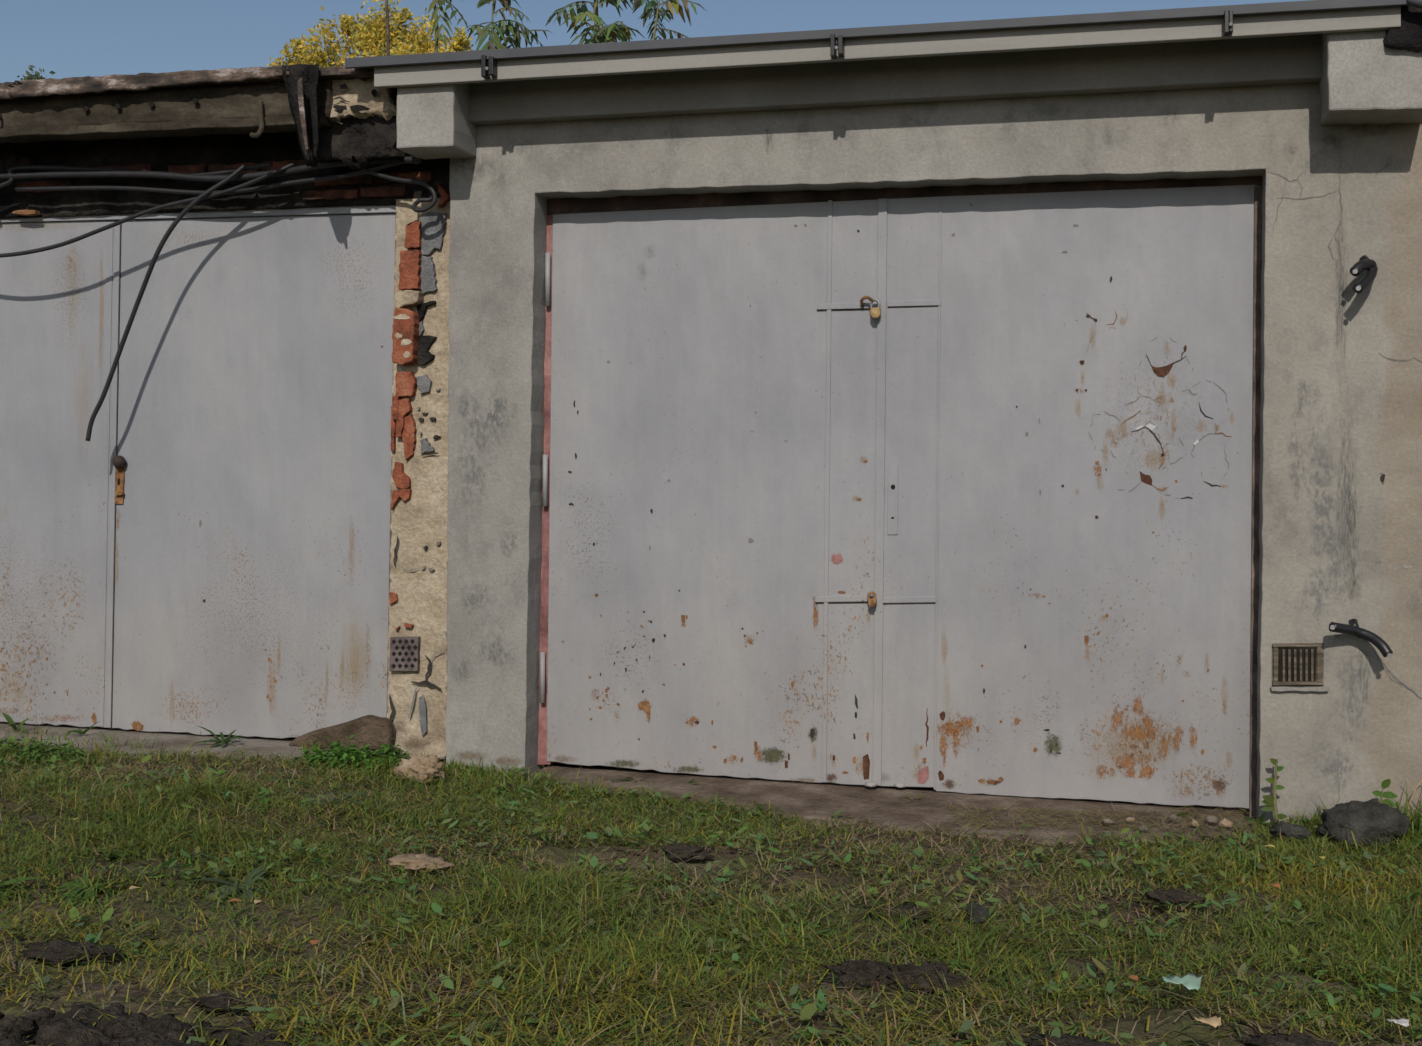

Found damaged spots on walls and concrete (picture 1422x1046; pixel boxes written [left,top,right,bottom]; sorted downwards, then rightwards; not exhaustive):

spalling [437,183,450,208]
spalling [381,211,441,510]
peeling [1146,337,1187,378]
peeling [1092,398,1178,491]
peeling [1189,380,1232,452]
rust [0,623,68,713]
rust [588,611,666,721]
rust [938,711,979,788]
rust [1082,698,1225,795]